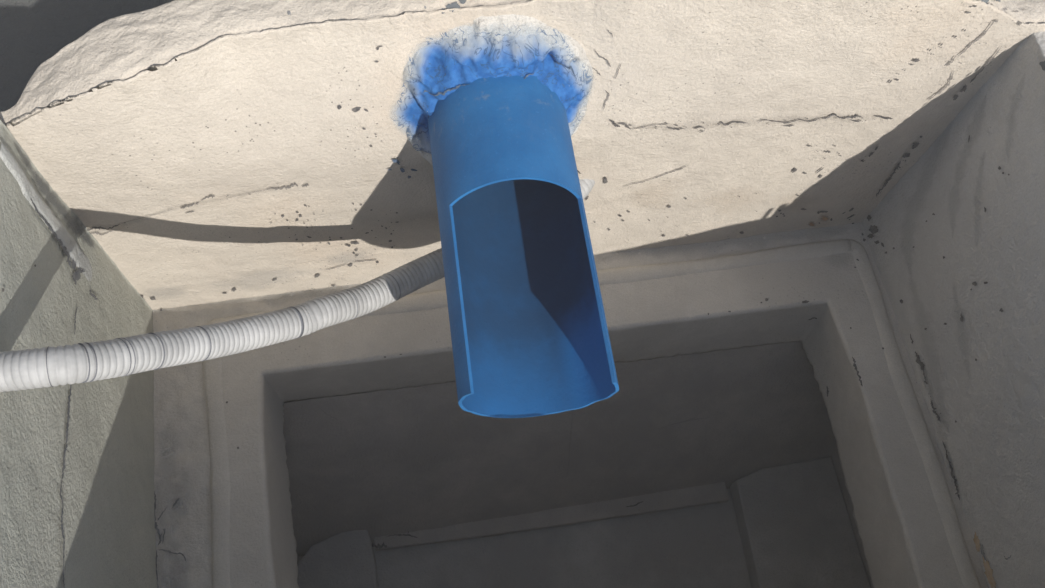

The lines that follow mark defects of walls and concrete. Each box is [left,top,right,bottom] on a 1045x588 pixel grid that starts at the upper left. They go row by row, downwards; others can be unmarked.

crack [423,84,469,96]
crack [524,30,893,133]
crack [87,183,309,235]
crack [60,386,72,588]